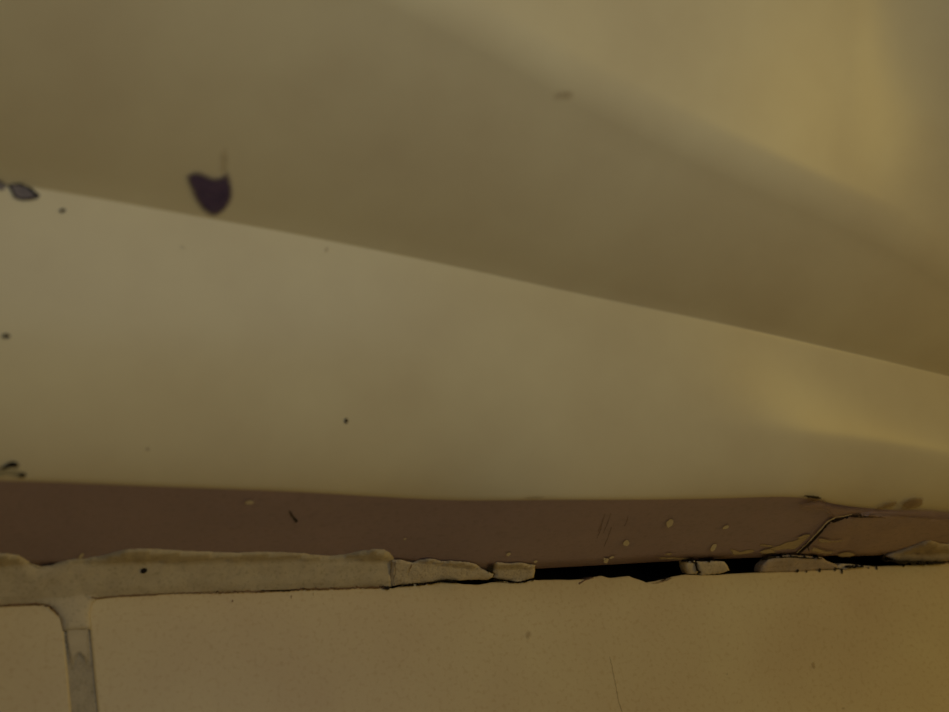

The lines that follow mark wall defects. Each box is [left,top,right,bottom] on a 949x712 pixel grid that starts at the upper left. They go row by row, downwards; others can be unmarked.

peeling [730,534,855,557]
crack [754,513,949,569]